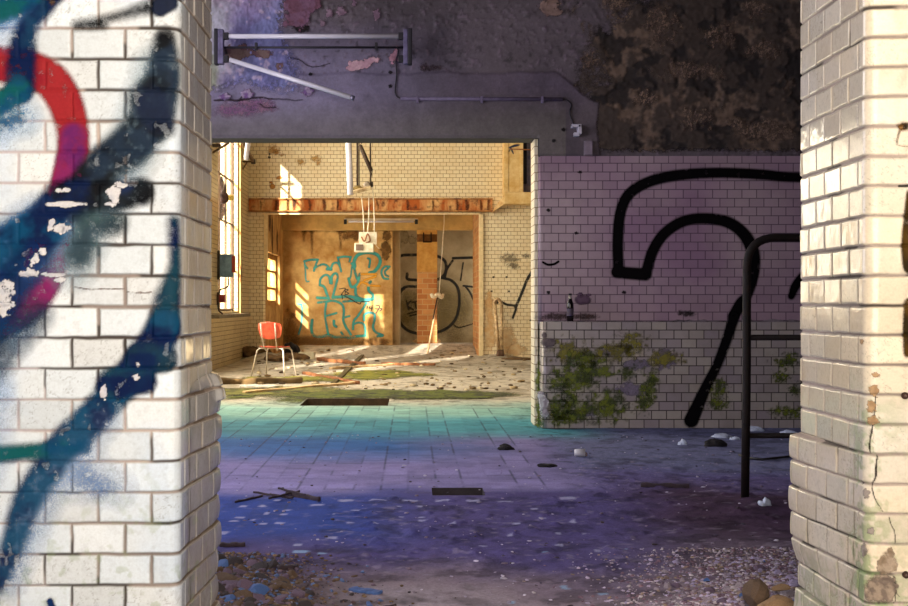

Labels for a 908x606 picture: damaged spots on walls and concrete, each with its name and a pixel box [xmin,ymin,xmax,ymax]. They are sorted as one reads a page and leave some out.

peeling [210,0,357,100]
peeling [346,49,398,71]
peeling [574,0,802,153]
peeling [46,188,87,208]
peeling [105,181,128,207]
peeling [48,219,71,235]
peeling [0,248,66,318]
crack [869,397,896,543]
spalling [864,547,899,603]